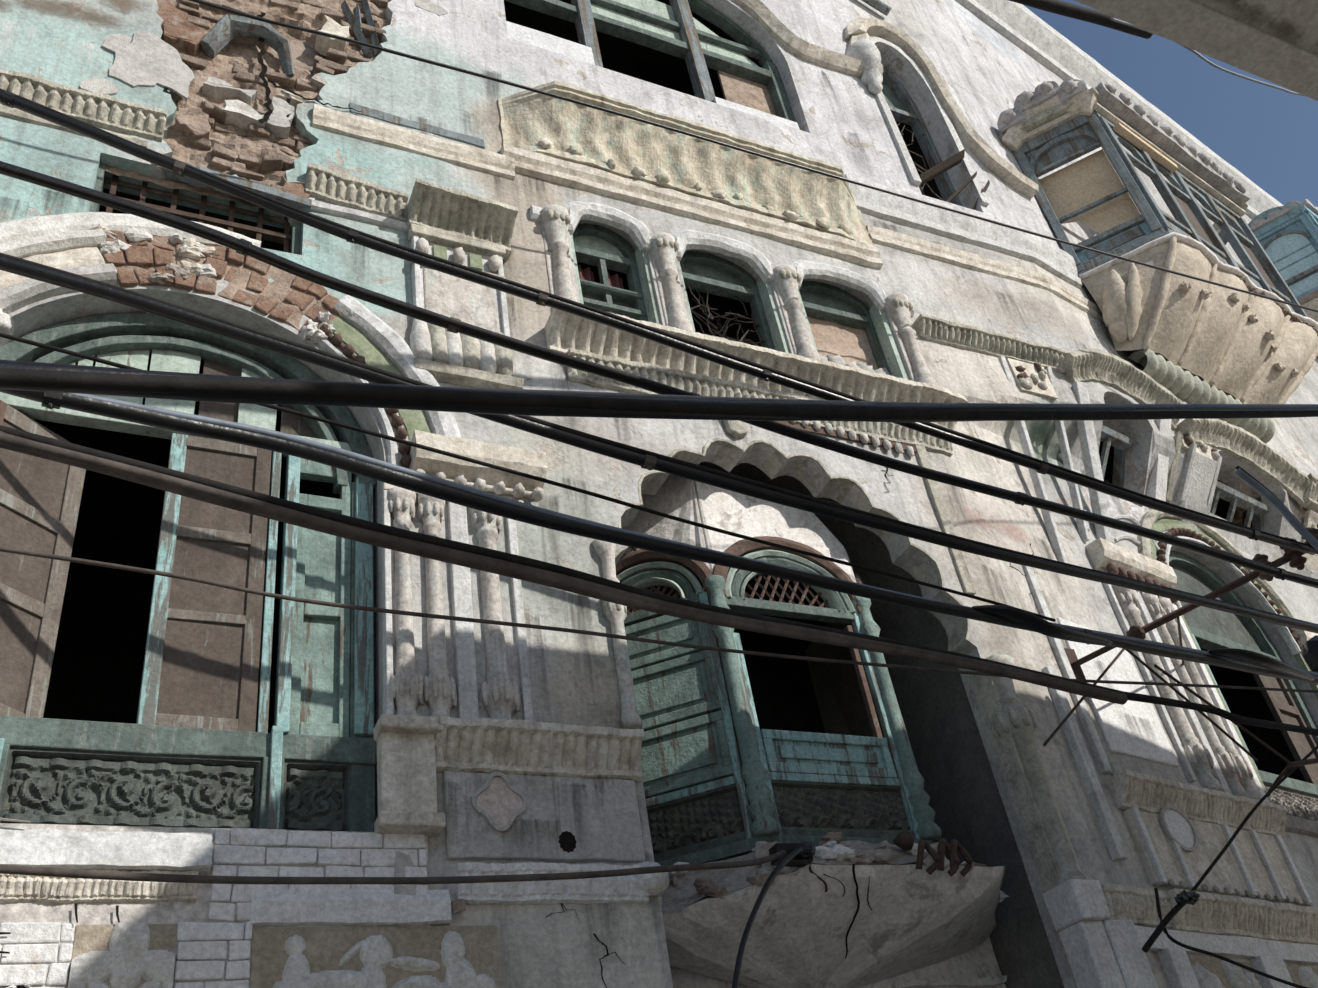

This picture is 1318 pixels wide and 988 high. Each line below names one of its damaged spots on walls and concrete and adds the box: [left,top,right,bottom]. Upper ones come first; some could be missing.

spalling [79,0,390,227]
crack [256,12,362,124]
flaking render [89,211,353,344]
crack [1,980,30,988]
crack [72,903,80,923]
crack [546,903,626,988]